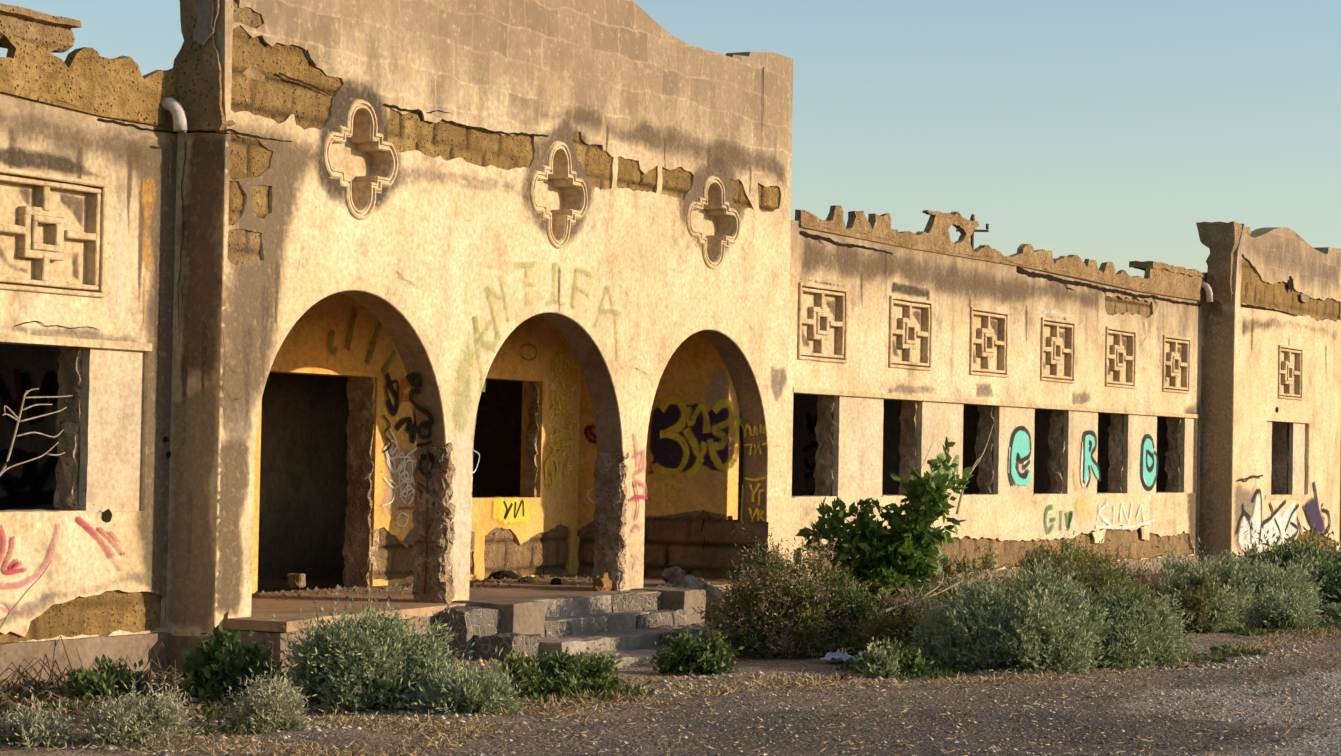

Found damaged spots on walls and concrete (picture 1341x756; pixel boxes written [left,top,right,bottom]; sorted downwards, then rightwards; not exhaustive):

spalling [231,0,342,129]
spalling [384,109,533,170]
spalling [573,132,692,199]
damp [524,110,783,240]
spalling [730,179,779,212]
spalling [1240,257,1339,321]
damp [0,81,408,627]
spalling [367,442,456,603]
spalling [470,450,629,591]
spalling [643,510,769,581]
spalling [926,525,1192,573]
spalling [0,590,162,643]